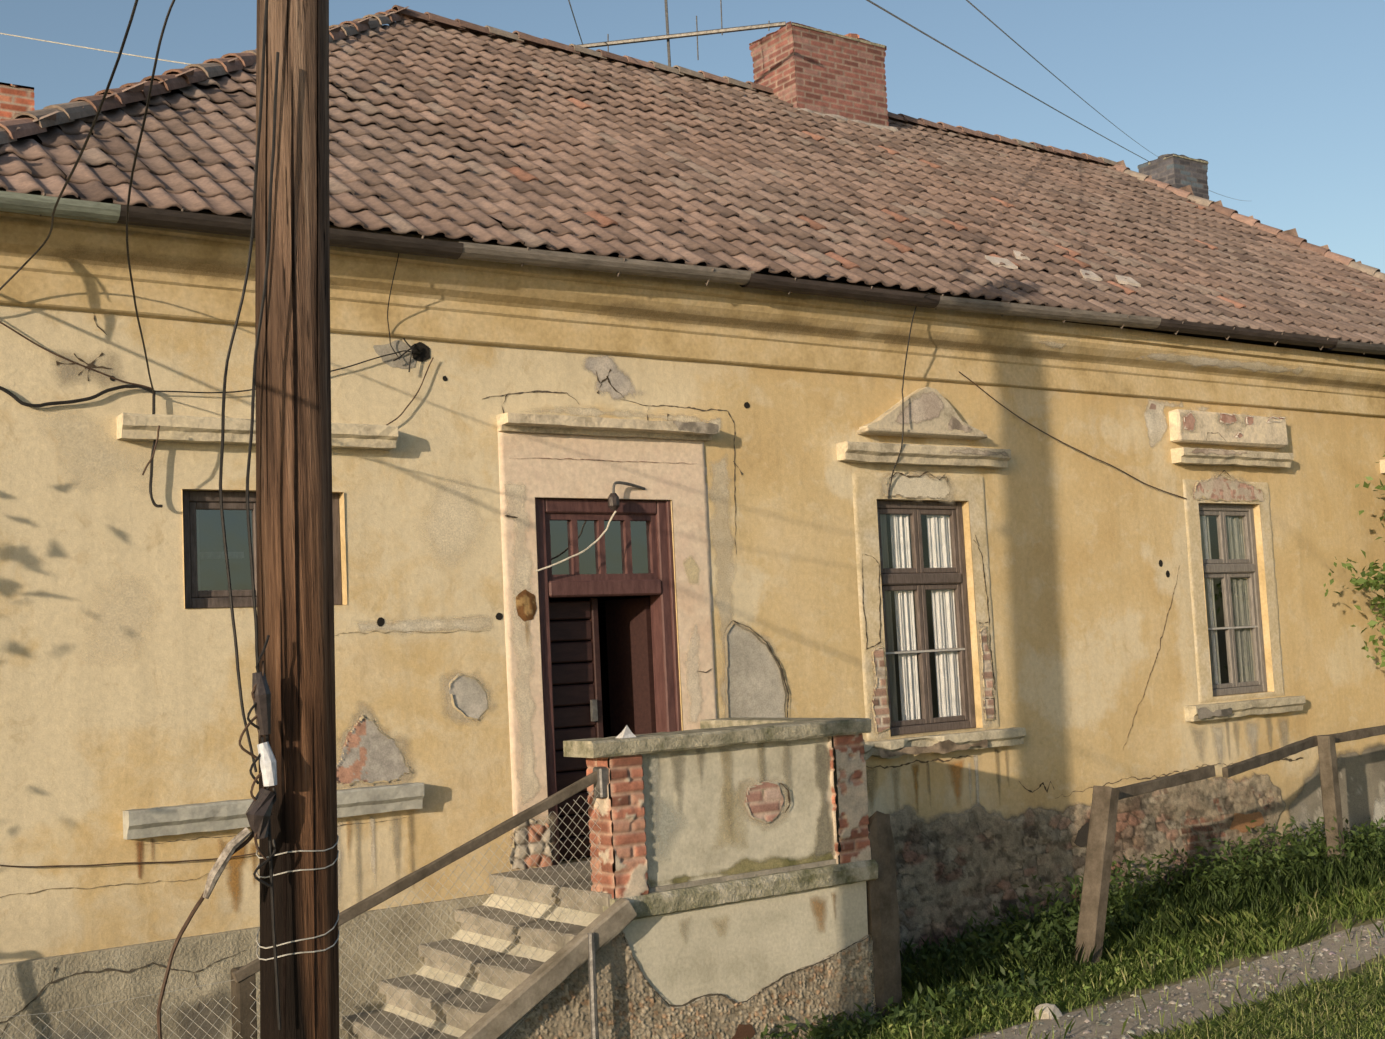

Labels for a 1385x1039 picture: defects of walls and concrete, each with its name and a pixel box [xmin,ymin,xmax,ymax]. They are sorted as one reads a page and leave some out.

crack [56,315,112,381]
crack [483,369,743,546]
crack [265,0,409,1039]
spalling [871,625,995,758]
water stain [337,818,375,896]
spalling [336,706,413,788]
water stain [393,814,413,872]
water stain [866,769,875,802]
flaking render [890,803,1091,962]
flaking render [1109,773,1286,891]
crack [0,950,245,1039]
spalling [507,930,876,1039]